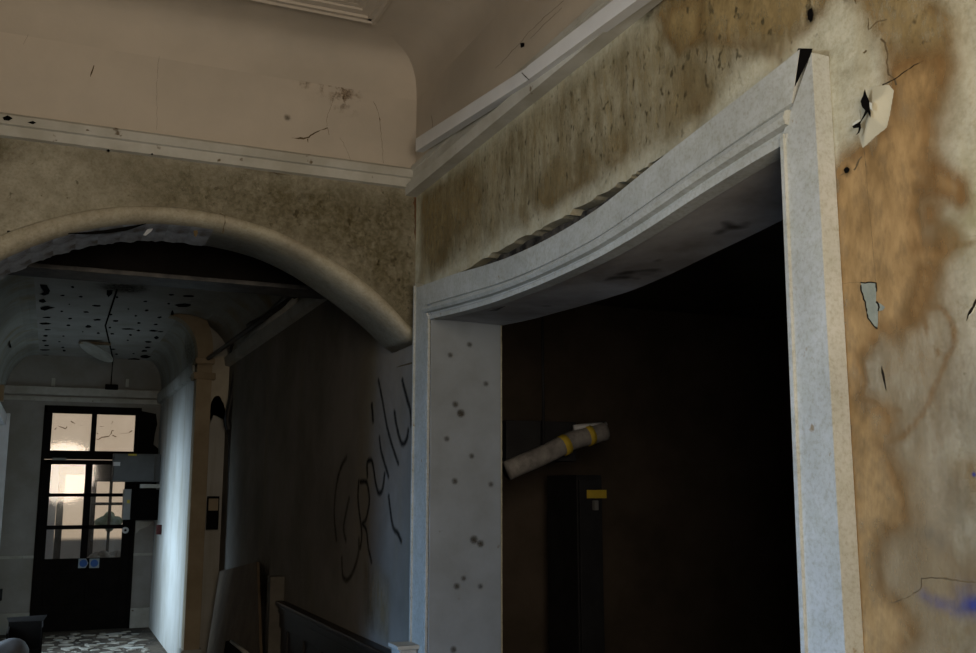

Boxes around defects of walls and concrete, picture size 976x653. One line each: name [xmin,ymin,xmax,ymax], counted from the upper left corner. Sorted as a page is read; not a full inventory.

spalling [852,90,872,135]
spalling [485,197,612,265]
peeling [860,282,885,329]
leakage [835,0,976,653]
crack [966,299,976,321]
crack [887,577,975,604]